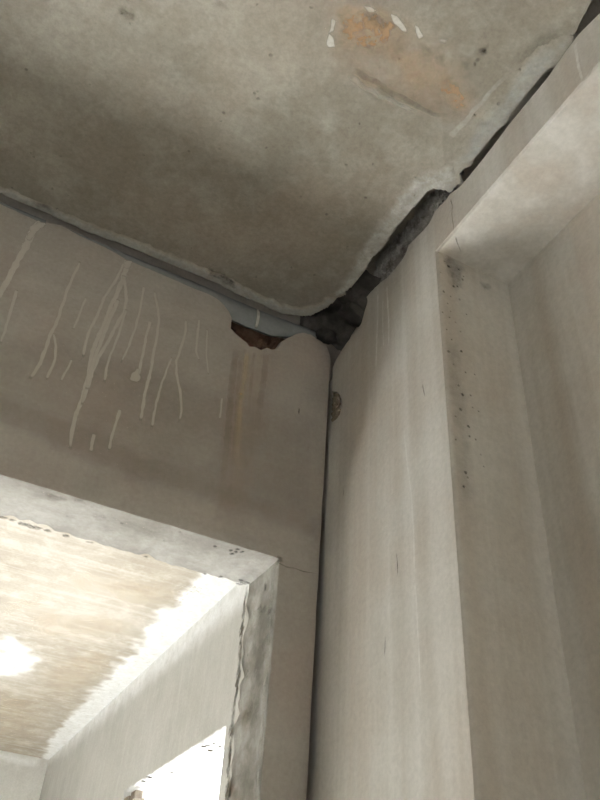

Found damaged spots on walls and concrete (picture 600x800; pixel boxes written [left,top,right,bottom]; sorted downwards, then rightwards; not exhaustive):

corrosion [327,6,423,47]
leakage [0,221,46,342]
leakage [69,260,132,449]
leakage [122,287,209,426]
spalling [231,322,285,350]
spalling [300,170,464,351]
leakage [0,632,48,681]